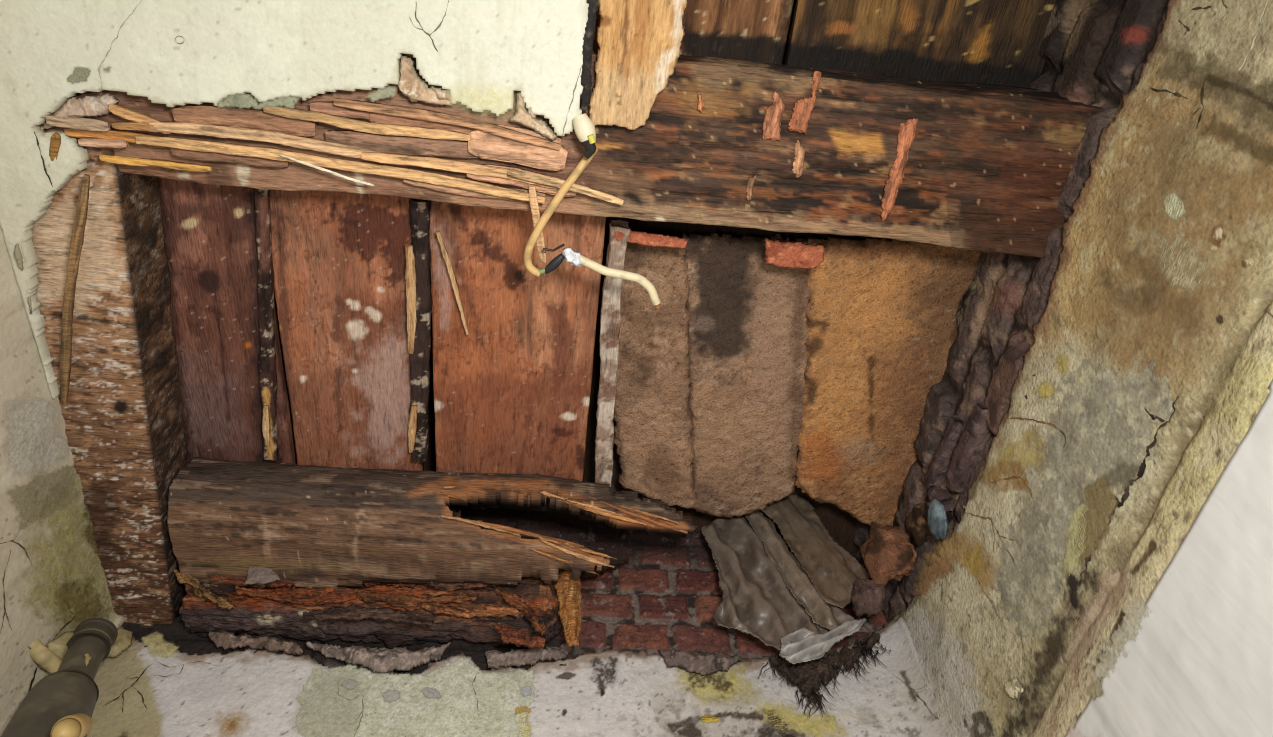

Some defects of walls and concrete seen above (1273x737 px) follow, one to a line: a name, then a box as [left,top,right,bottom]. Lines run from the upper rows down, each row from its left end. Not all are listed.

crack [409,0,449,51]
crack [1179,0,1228,31]
crack [1239,0,1268,71]
spalling [40,67,120,130]
peeling [218,94,300,109]
spalling [368,56,454,106]
spalling [510,92,557,141]
leakage [1164,48,1273,161]
peeling [9,466,77,529]
crack [1080,396,1179,581]
leakage [29,477,112,635]
flaking render [121,517,780,737]